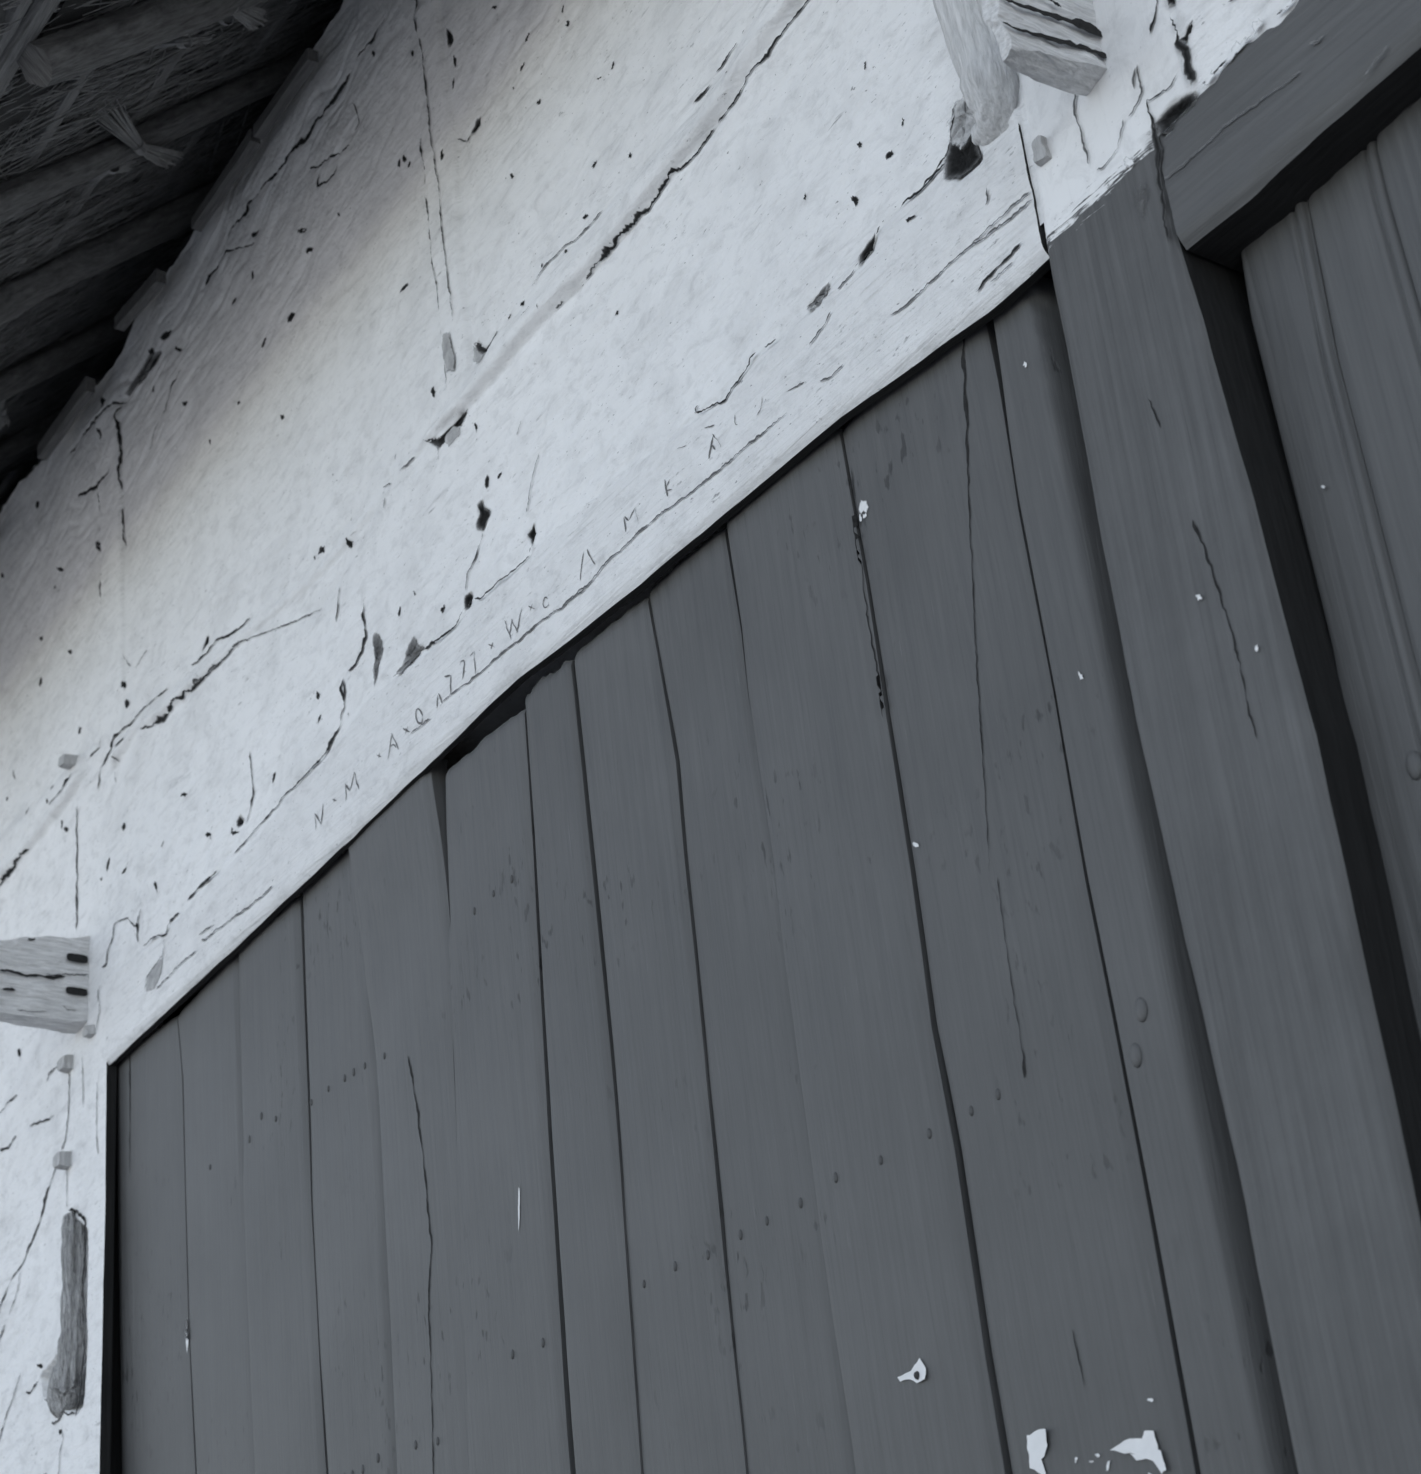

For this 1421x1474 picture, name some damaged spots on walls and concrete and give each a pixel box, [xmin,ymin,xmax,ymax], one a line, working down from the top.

crack [204,0,455,383]
crack [521,0,808,315]
crack [1003,0,1322,240]
crack [26,371,180,605]
crack [0,587,367,1029]
spalling [373,633,424,685]
crack [0,1067,100,1474]